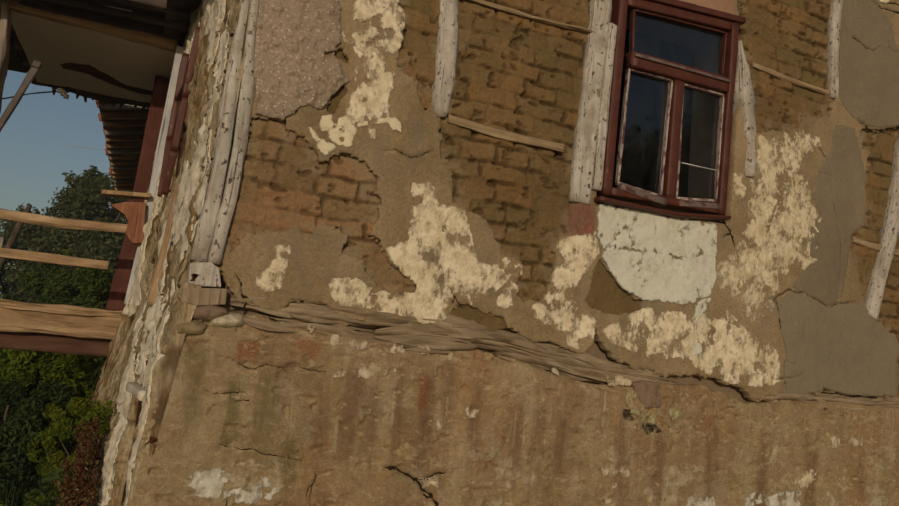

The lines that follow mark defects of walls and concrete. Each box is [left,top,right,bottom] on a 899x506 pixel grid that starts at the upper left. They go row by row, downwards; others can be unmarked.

spalling [214,0,833,388]
spalling [850,128,898,301]
peeling [98,0,232,506]
spalling [877,235,899,375]
peeling [188,467,279,504]
crack [221,444,316,506]
crack [385,466,446,506]
peeling [686,492,716,506]
peeling [743,469,817,506]